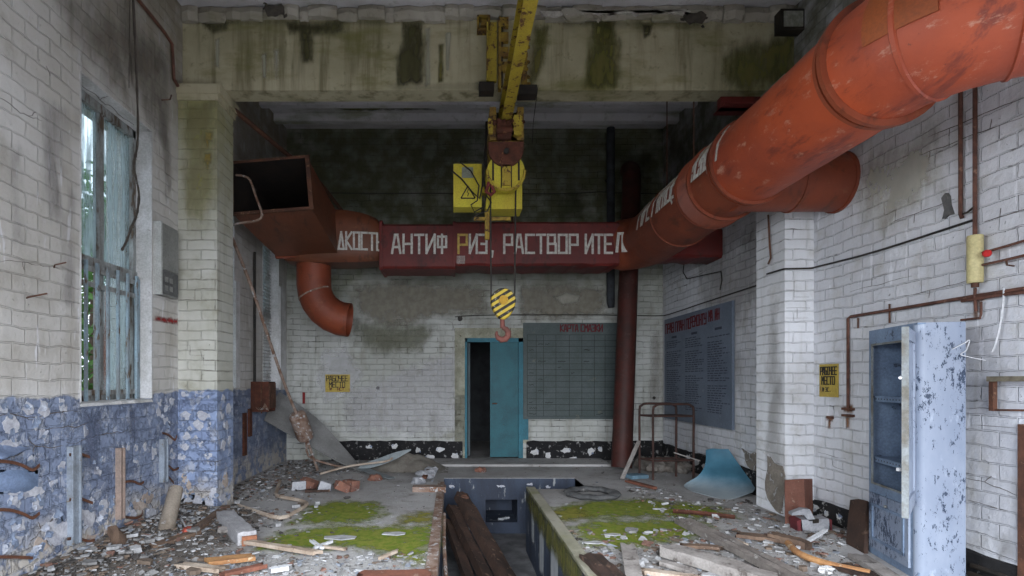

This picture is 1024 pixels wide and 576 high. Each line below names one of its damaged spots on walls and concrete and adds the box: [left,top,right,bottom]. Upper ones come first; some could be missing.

water stain [397,22,450,85]
water stain [585,21,621,89]
water stain [186,103,211,215]
peeling [2,461,67,571]